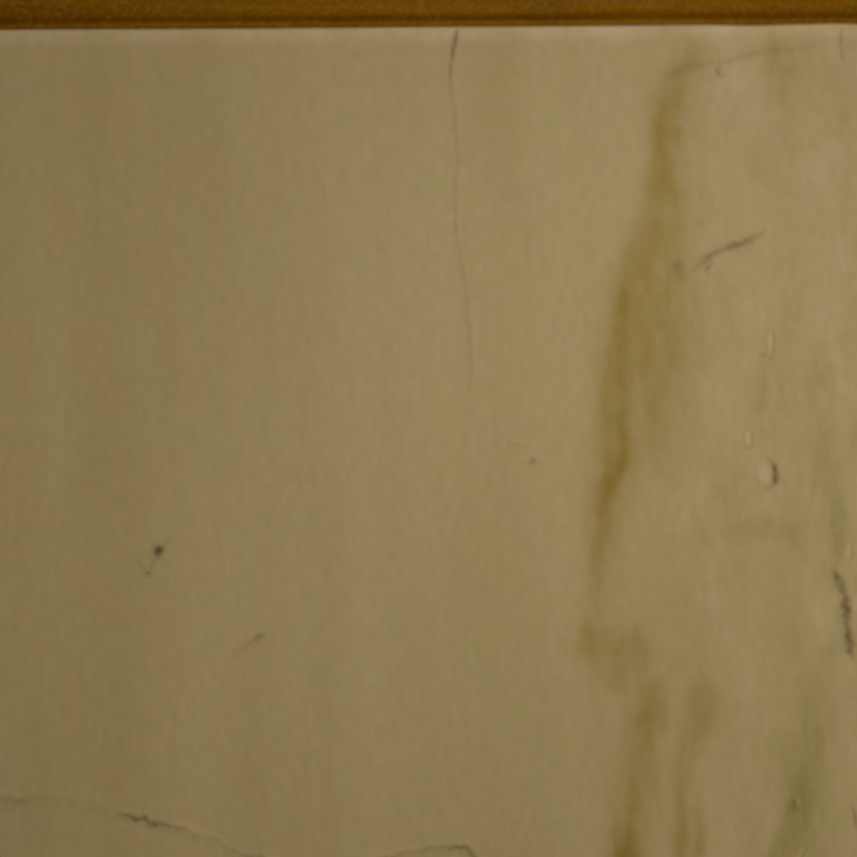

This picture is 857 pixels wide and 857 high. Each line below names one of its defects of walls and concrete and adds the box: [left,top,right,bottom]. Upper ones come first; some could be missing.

crack [664,224,770,285]
water stain [552,38,726,857]
crack [823,538,857,663]